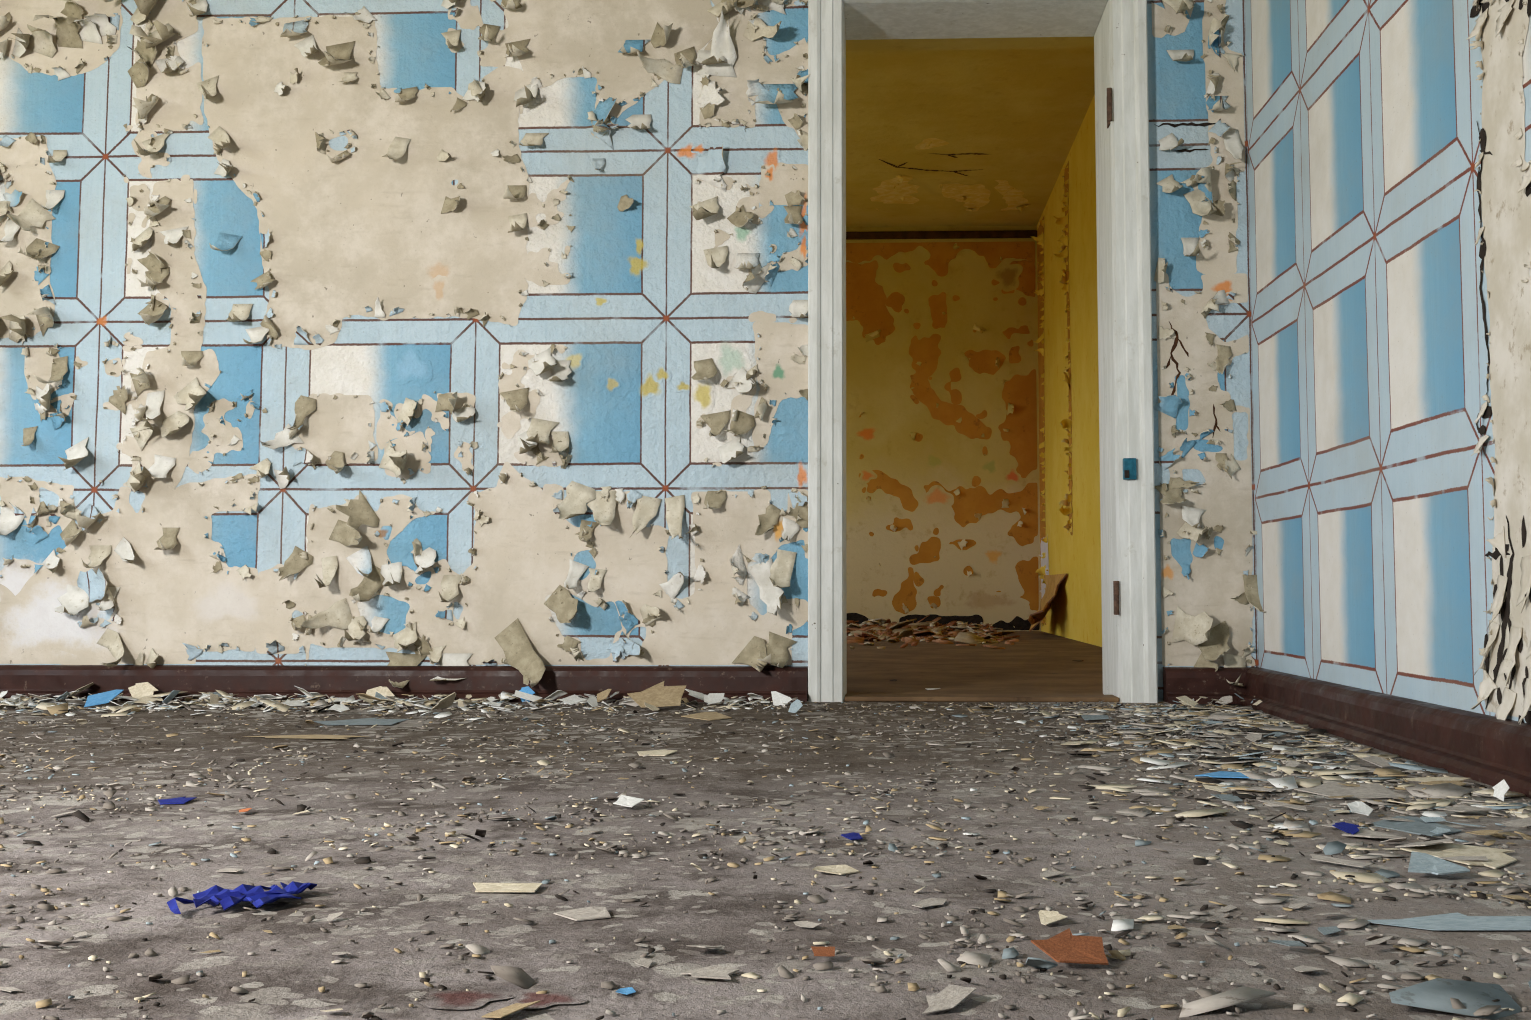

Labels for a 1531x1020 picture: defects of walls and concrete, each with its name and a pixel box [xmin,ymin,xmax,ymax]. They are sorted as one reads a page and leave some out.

peeling [0,0,810,688]
peeling [846,161,1073,627]
peeling [1148,0,1267,687]
peeling [1466,0,1531,724]